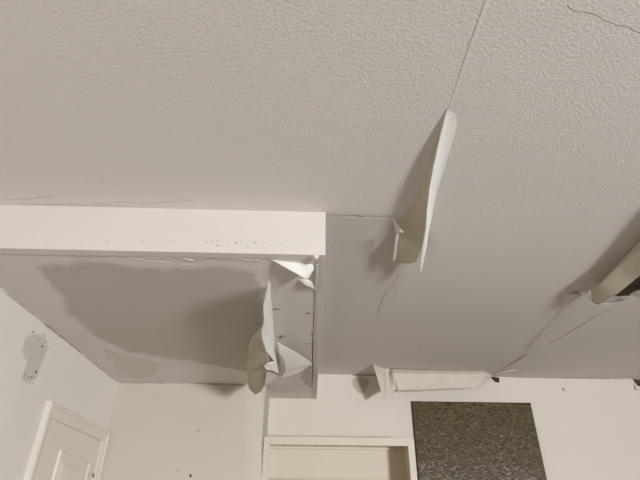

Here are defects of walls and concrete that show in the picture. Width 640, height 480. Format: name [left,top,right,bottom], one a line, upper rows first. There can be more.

peeling [268,254,319,292]
peeling [578,241,640,305]
peeling [277,343,312,388]